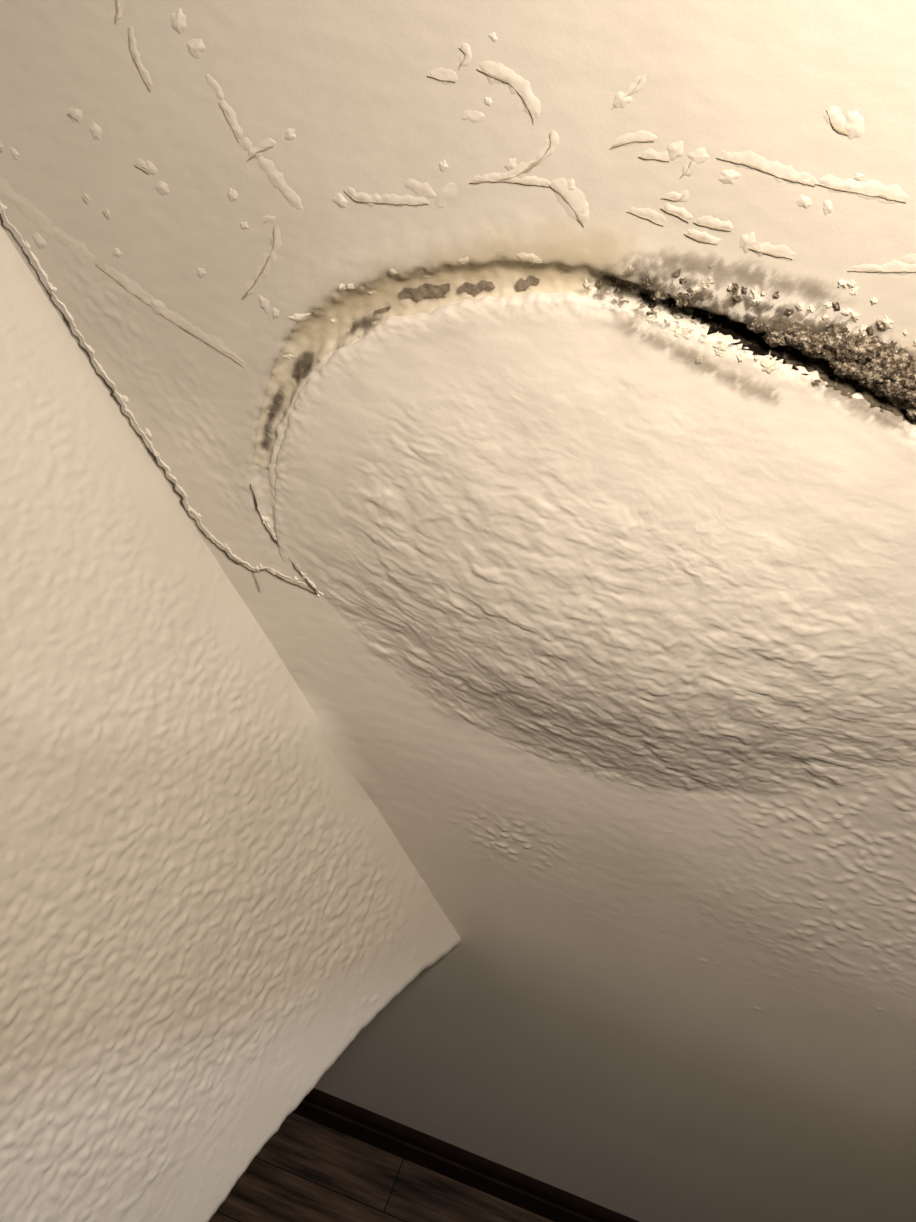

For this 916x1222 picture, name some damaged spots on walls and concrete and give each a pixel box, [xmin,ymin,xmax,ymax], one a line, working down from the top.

leakage [293,353,313,381]
leakage [350,318,378,332]
peeling [253,252,592,470]
flaking render [646,264,733,340]
leakage [583,265,916,422]
flaking render [713,335,791,374]
flaking render [751,284,761,300]
flaking render [795,279,878,336]
crack [0,201,324,597]
leakage [263,391,283,449]